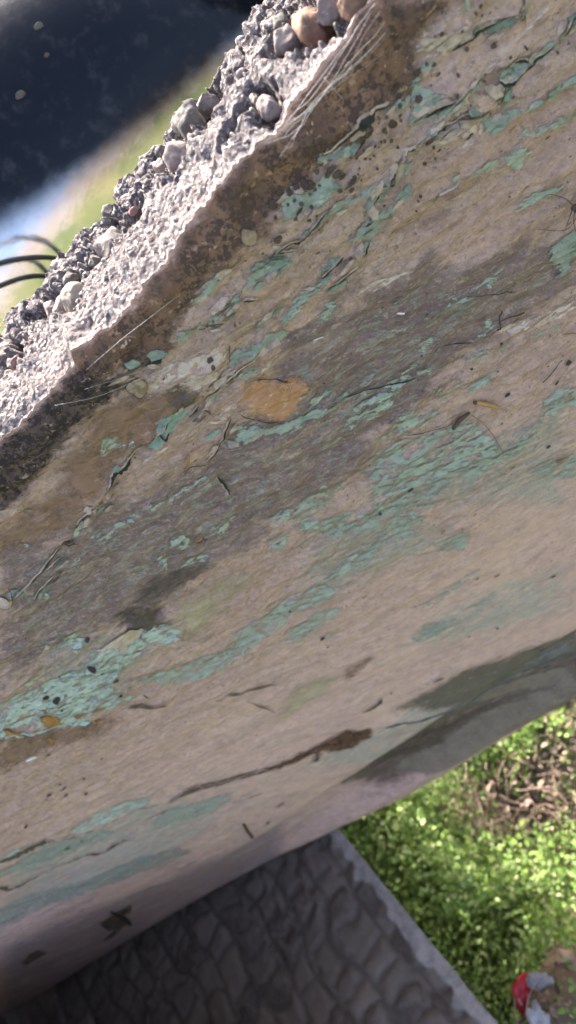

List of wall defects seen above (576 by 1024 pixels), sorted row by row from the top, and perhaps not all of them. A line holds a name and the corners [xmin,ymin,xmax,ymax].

spalling [0,0,370,439]
peeling [276,146,413,252]
damp [0,0,446,549]
peeling [359,271,412,295]
peeling [445,269,503,308]
peeling [459,302,576,361]
corrosion [244,379,308,421]
peeling [0,325,576,740]
damp [118,566,204,633]
damp [341,630,576,783]
corrosion [171,728,373,801]